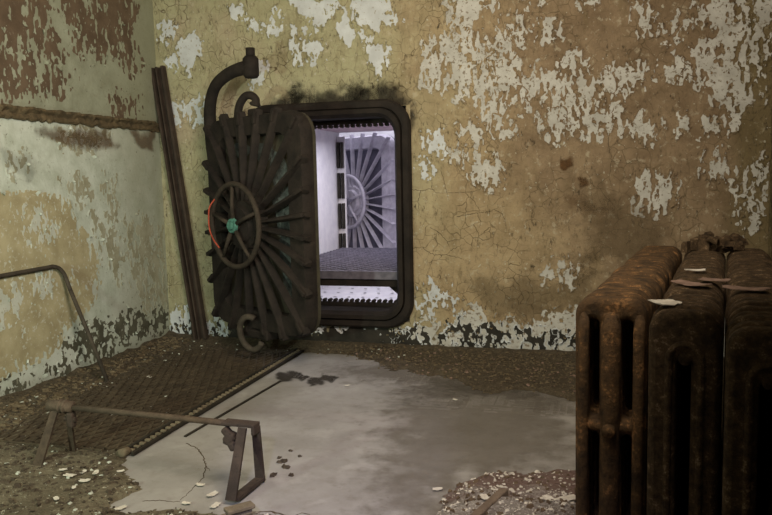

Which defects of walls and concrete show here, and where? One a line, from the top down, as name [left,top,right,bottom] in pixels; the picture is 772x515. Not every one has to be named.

peeling [0,0,146,120]
peeling [50,124,114,160]
peeling [156,18,205,78]
peeling [246,56,271,91]
peeling [225,0,405,84]
peeling [413,0,772,237]
peeling [0,146,192,395]
spalling [290,248,583,351]